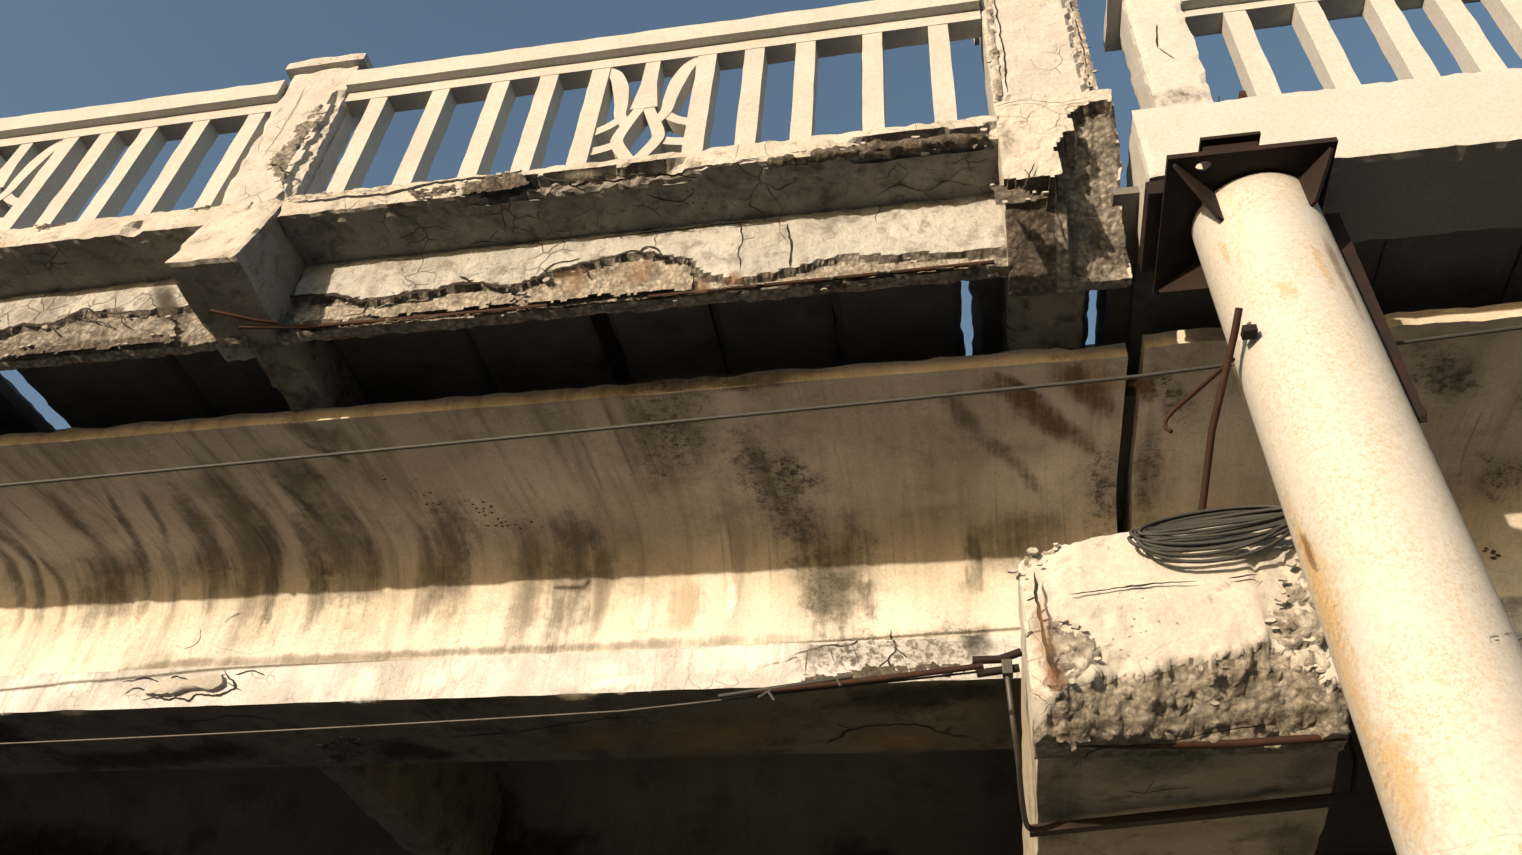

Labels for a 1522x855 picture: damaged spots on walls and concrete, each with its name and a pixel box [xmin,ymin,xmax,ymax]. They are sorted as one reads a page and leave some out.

spalling [267,103,529,202]
crack [263,91,793,317]
crack [878,163,975,203]
spalling [0,315,177,359]
spalling [210,257,995,330]
rust [997,377,1079,443]
rust [1059,366,1114,413]
leakage [87,498,145,615]
leakage [552,522,594,623]
leakage [729,430,868,621]
spalling [1043,558,1346,752]
crack [823,724,968,744]